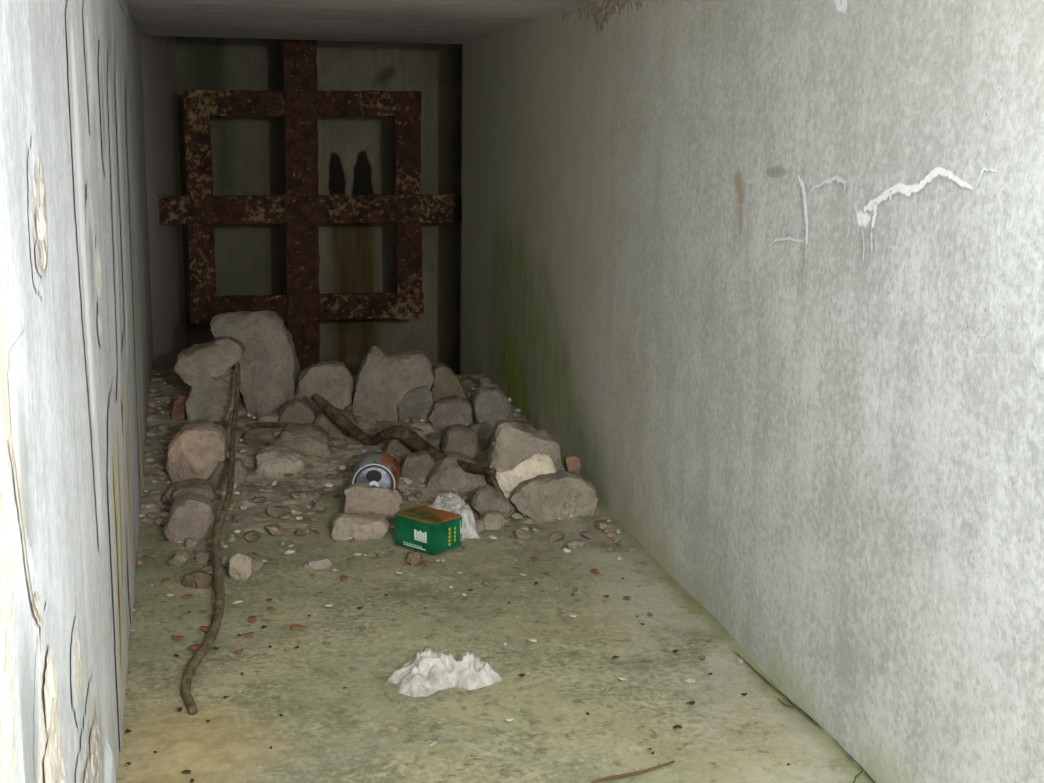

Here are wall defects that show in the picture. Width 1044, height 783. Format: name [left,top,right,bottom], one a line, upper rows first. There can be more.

spalling [27,134,51,300]
crack [763,159,1000,291]
crack [11,437,43,639]
peeling [33,599,104,783]